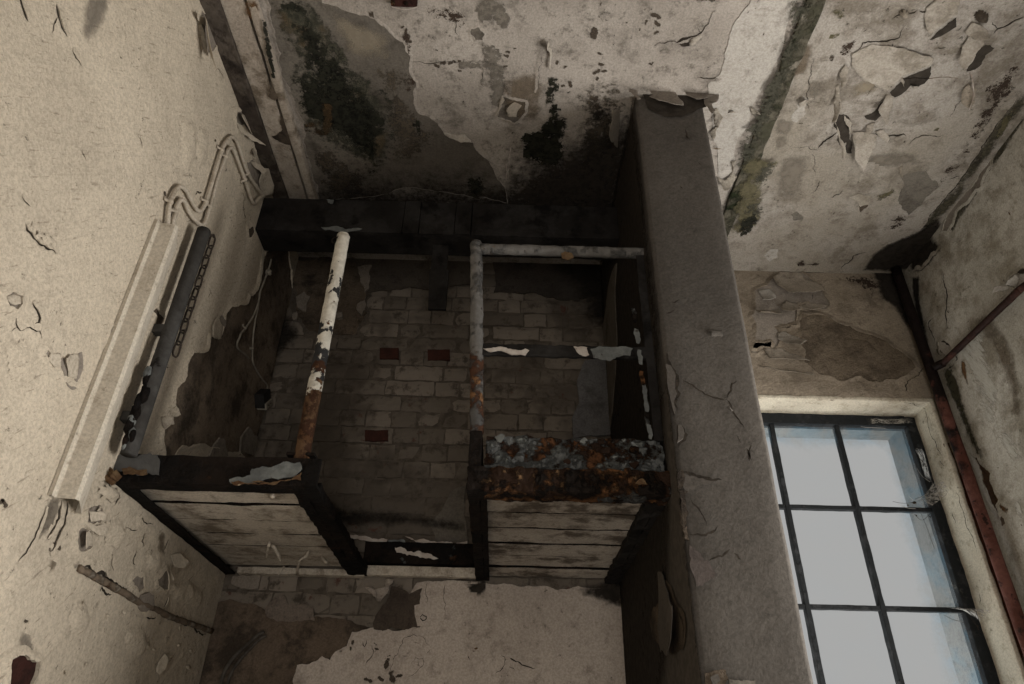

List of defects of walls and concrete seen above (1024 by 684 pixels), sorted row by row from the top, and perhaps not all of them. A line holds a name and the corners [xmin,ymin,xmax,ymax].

crack [654,11,717,49]
crack [860,9,926,49]
water stain [262,1,433,192]
peeling [265,0,508,204]
water stain [505,52,624,166]
peeling [629,89,736,139]
water stain [777,120,805,196]
crack [22,193,58,254]
spalling [332,260,373,342]
flaking render [113,250,332,499]
crack [665,354,752,461]
spalling [365,579,422,631]